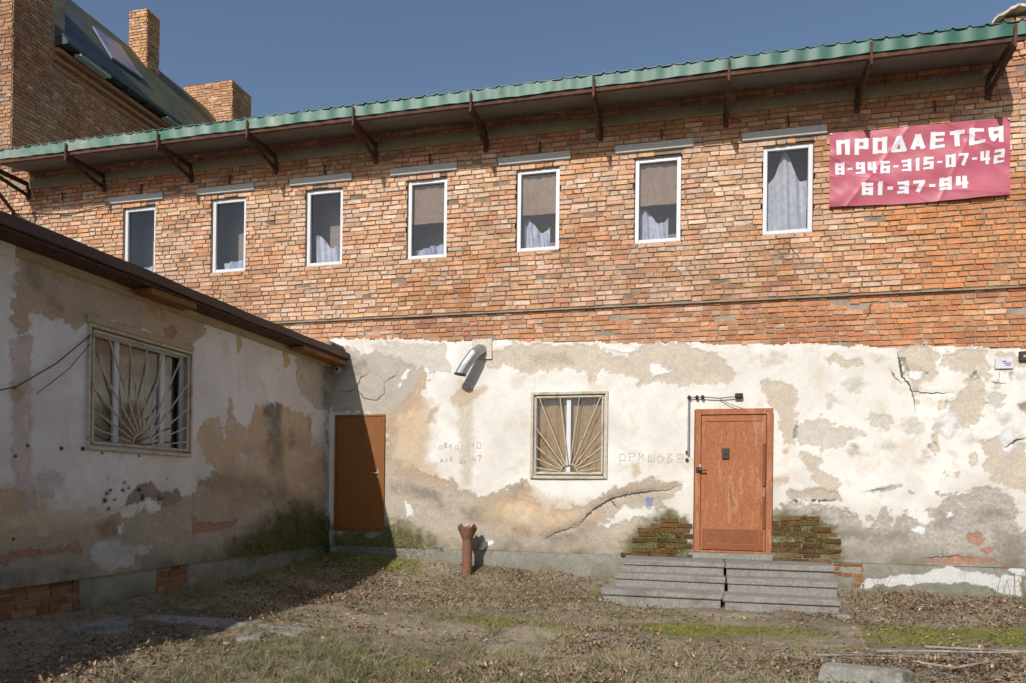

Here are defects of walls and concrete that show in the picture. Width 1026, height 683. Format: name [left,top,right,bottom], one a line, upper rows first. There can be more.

peeling [10,259,206,344]
crack [891,353,956,412]
flaking render [0,357,330,590]
crack [545,486,676,539]
flaking render [761,380,1026,597]